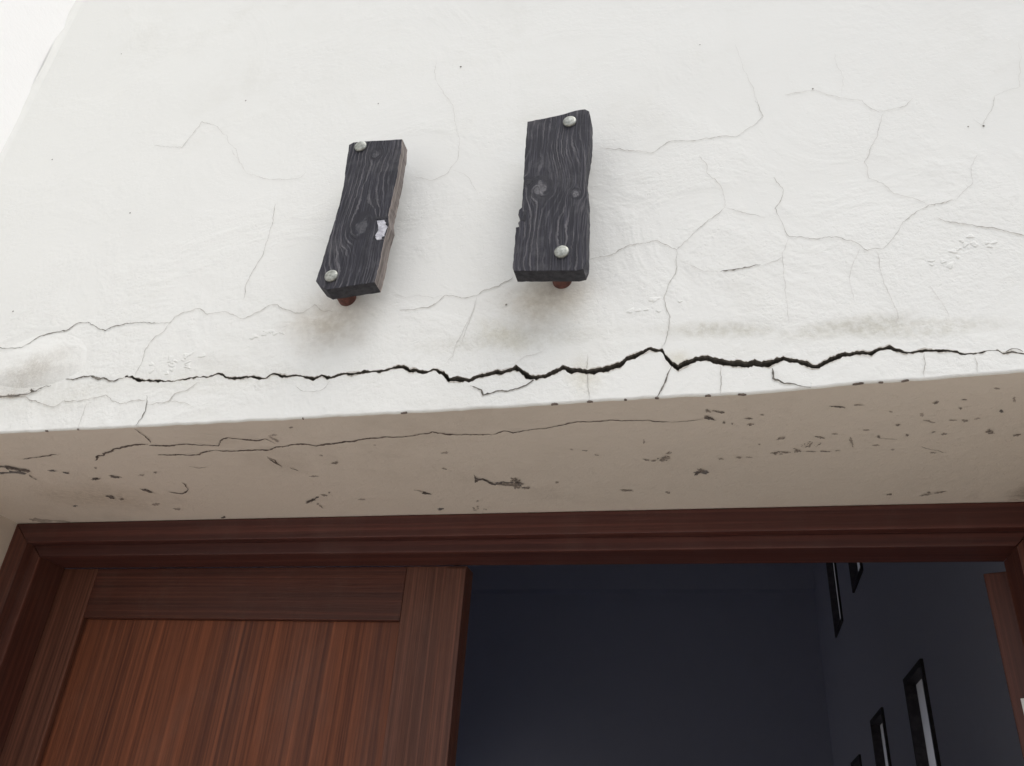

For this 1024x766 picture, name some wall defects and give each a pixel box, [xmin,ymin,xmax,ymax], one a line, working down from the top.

crack [0,64,1024,494]
spalling [770,433,854,455]
spalling [0,466,36,480]
spalling [474,475,530,489]